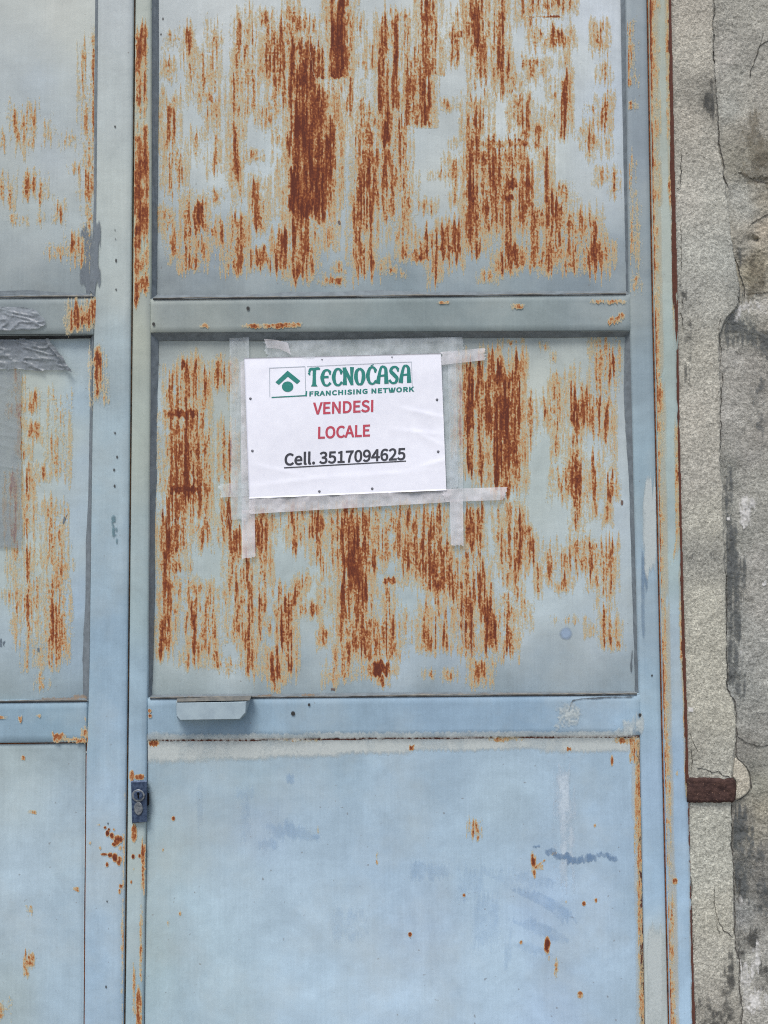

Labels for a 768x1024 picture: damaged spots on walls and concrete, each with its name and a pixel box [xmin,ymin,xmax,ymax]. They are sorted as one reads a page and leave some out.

corrosion [0,33,95,271]
crack [712,3,768,185]
corrosion [1,369,74,691]
corrosion [133,0,695,1024]
corrosion [89,824,146,895]
corrosion [129,770,144,782]
corrosion [121,911,143,1024]